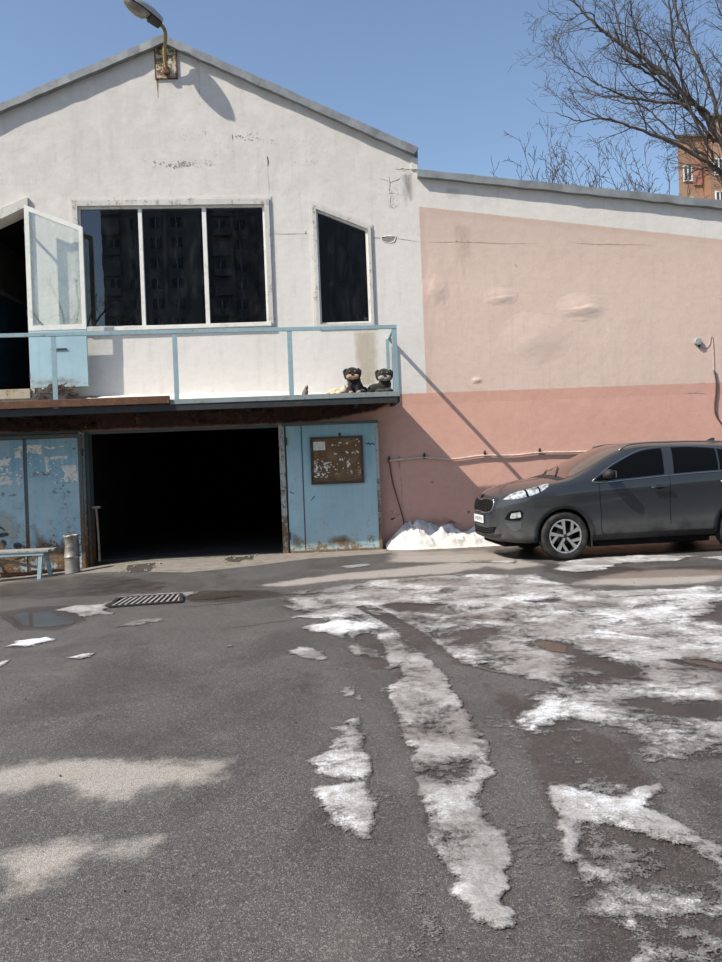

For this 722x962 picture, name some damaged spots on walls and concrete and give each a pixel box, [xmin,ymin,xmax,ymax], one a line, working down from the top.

corrosion [38,539,65,562]